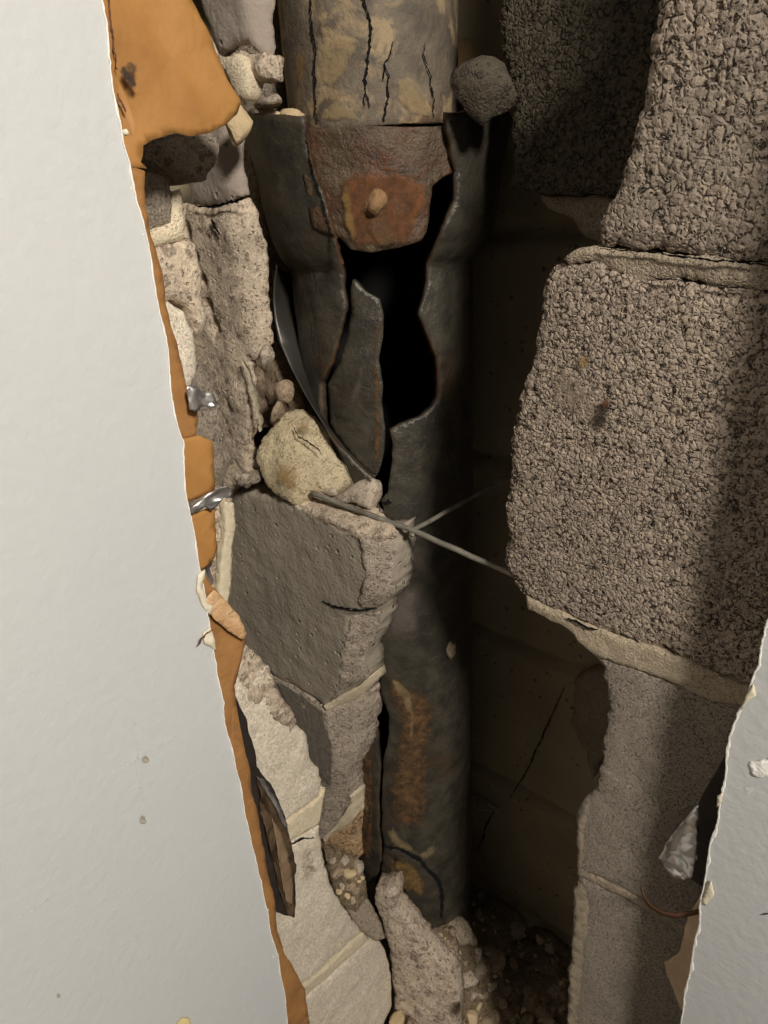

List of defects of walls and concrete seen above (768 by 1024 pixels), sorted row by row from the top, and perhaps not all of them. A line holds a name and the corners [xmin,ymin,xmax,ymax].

rust [341,173,424,245]
spalling [276,494,397,701]
spalling [238,645,333,785]
rust [391,681,433,825]
crack [478,685,566,851]
spalling [570,664,611,780]
spalling [748,759,768,778]